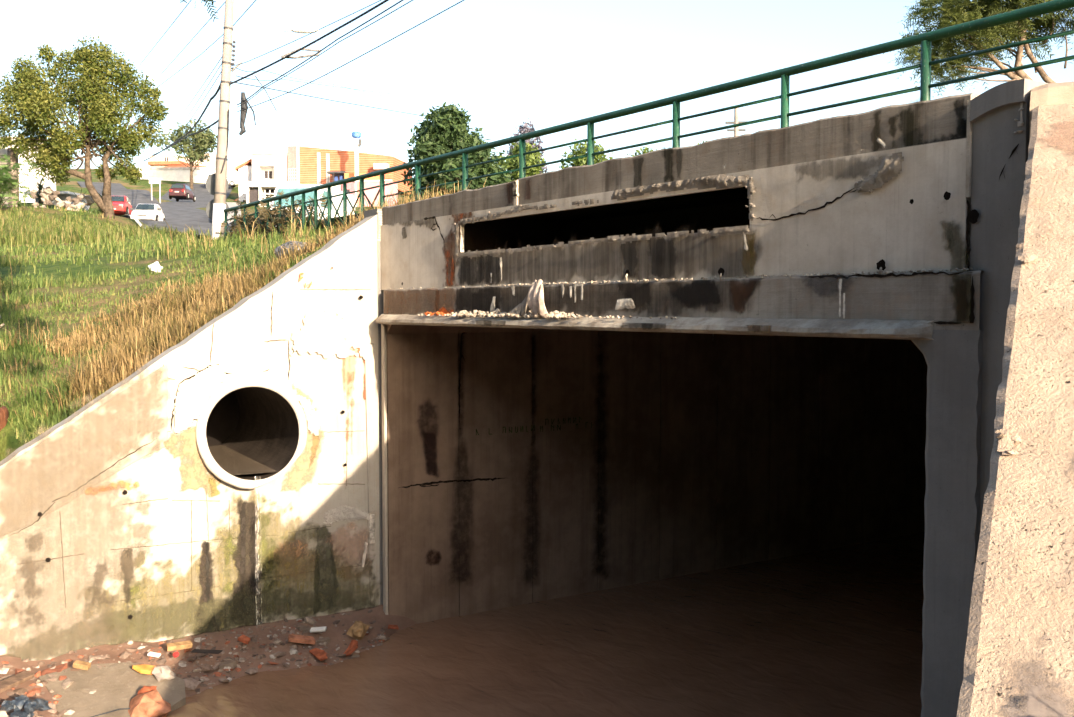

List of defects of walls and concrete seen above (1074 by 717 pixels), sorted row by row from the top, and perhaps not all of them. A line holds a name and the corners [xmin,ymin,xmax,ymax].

spalling [454,174,757,259]
crack [756,188,856,221]
damp [456,228,761,329]
damp [418,401,437,475]
damp [0,371,375,660]
damp [427,444,471,582]
crack [399,478,503,488]
damp [1006,664,1074,717]